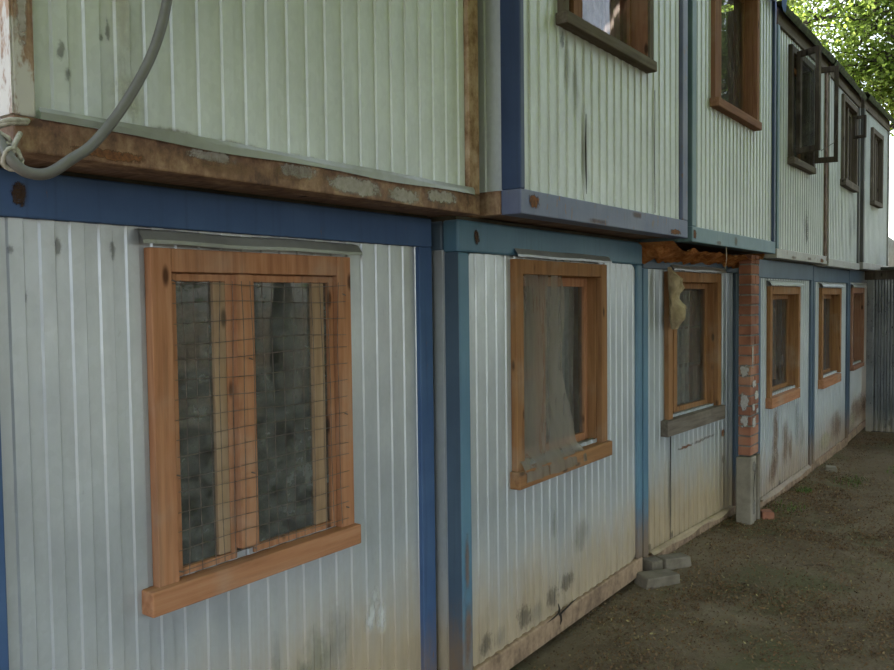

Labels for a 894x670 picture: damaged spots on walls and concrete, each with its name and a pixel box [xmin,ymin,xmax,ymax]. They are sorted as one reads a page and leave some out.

corrosion [11,181,26,207]